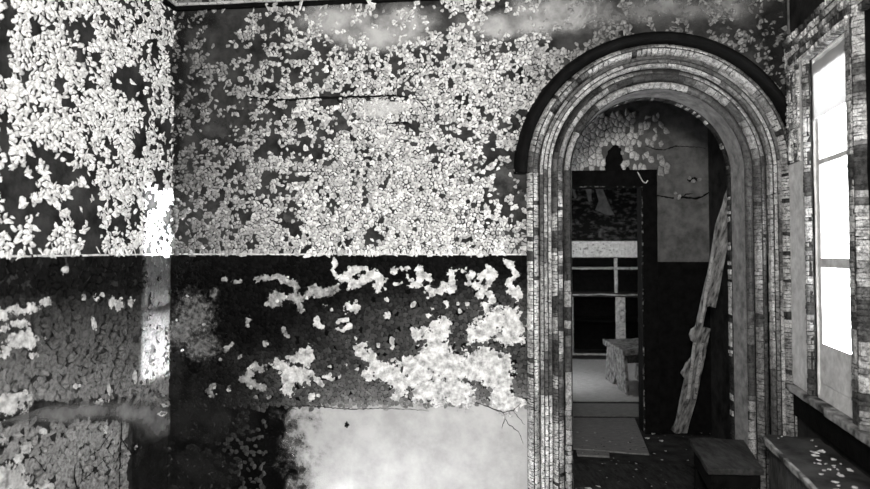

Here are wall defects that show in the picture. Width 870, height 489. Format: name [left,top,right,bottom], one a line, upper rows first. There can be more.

crack [0,252,527,489]
flaking render [0,0,656,489]
crack [247,94,429,111]
spalling [581,97,735,439]
crack [657,192,709,200]
peeling [666,0,787,89]